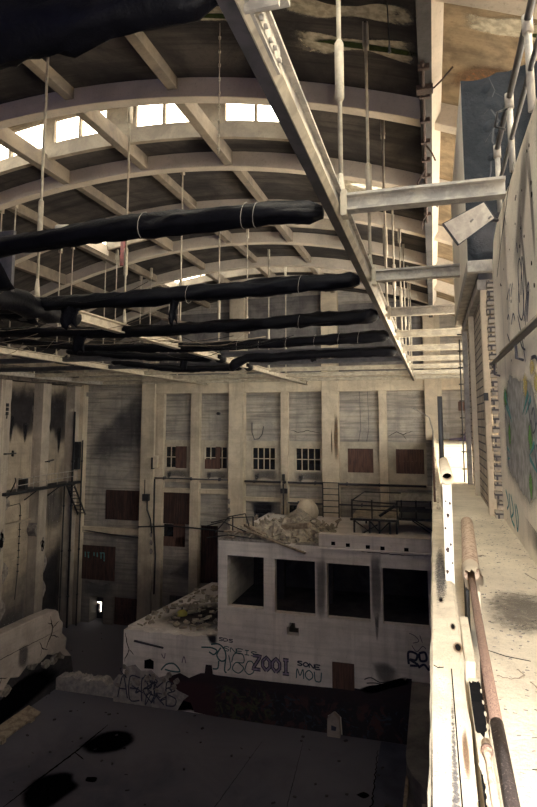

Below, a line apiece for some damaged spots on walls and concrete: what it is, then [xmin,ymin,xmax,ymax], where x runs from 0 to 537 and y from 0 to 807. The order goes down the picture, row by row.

efflorescence [287,0,411,24]
efflorescence [302,32,414,63]
leakage [9,388,34,441]
leakage [49,393,67,453]
crack [0,620,59,683]
corrosion [481,738,499,807]